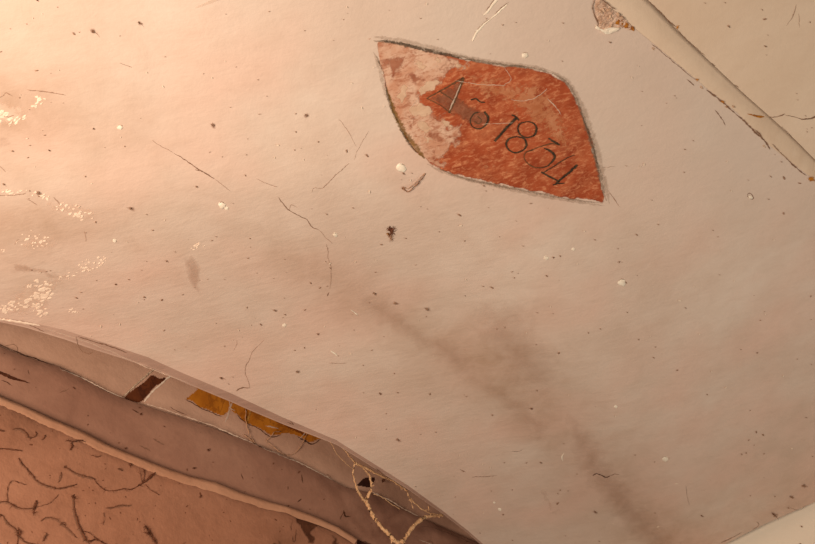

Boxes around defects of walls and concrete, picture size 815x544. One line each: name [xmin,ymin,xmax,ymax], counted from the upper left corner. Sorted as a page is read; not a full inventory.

crack [472,0,507,41]
flaking render [592,0,635,34]
crack [652,45,815,176]
flaking render [0,256,332,480]